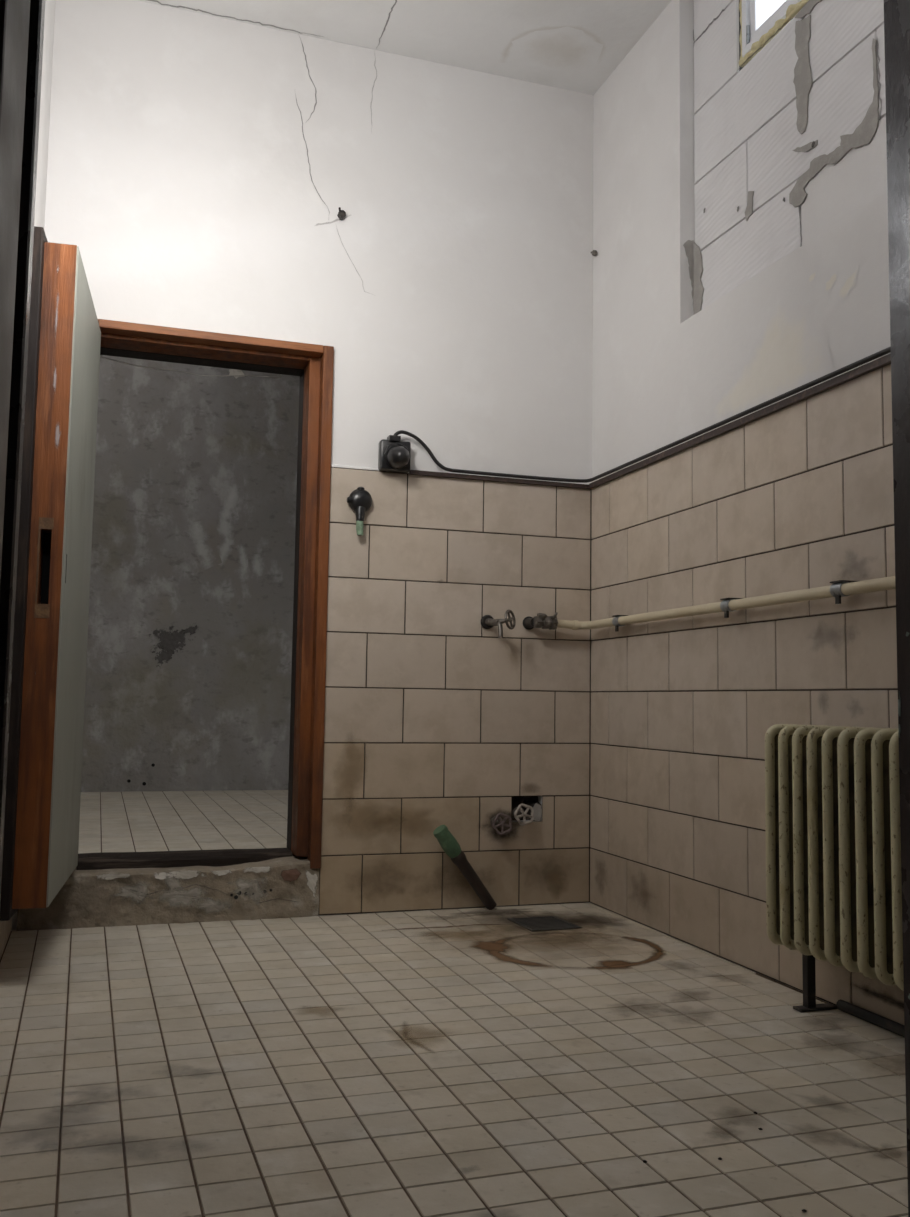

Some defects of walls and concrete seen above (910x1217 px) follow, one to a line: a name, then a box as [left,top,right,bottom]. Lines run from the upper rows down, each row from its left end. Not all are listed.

water stain [82,435,293,788]
peeling [96,867,318,913]
rust [393,924,543,966]
rust [592,937,664,969]